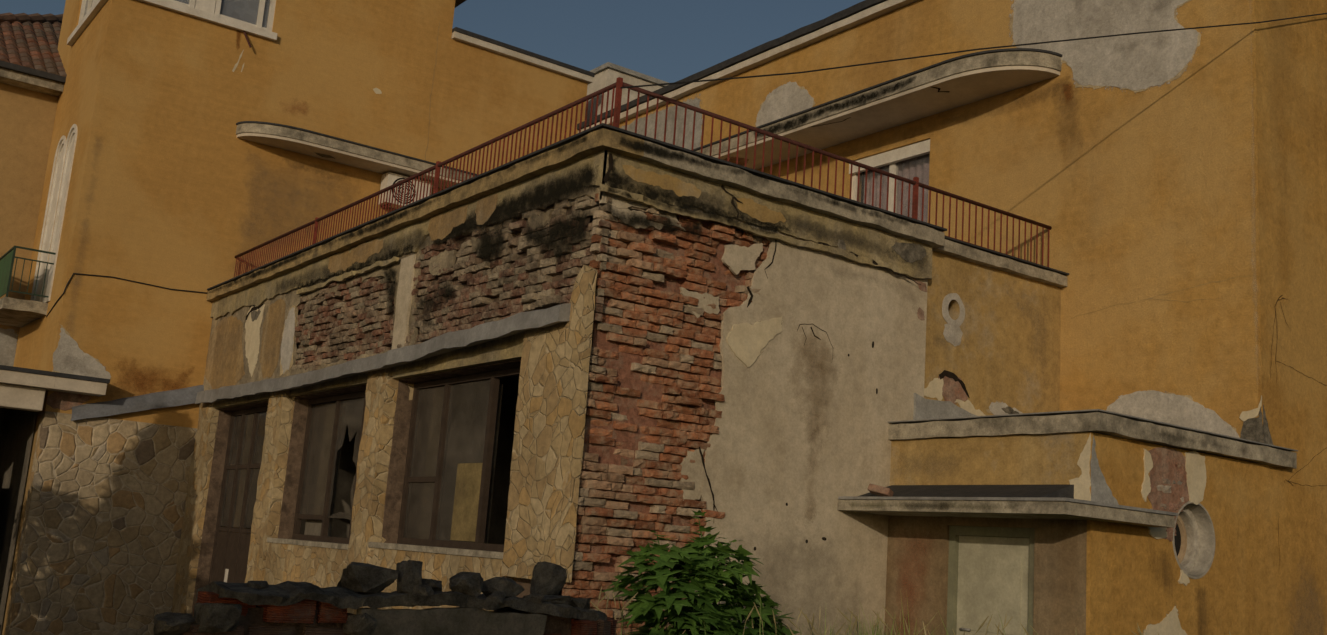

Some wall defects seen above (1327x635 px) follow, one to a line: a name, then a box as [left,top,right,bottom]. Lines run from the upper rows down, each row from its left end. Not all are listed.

flaking render [1009,0,1202,93]
flaking render [755,81,815,127]
damp [449,159,789,261]
crack [747,240,777,307]
flaking render [52,324,111,379]
flaking render [245,303,265,377]
crack [797,324,833,359]
crack [1270,295,1327,386]
flaking render [277,165,927,635]
flaking render [924,370,1022,416]
flaking render [1106,390,1274,445]
flaking render [1141,447,1207,542]